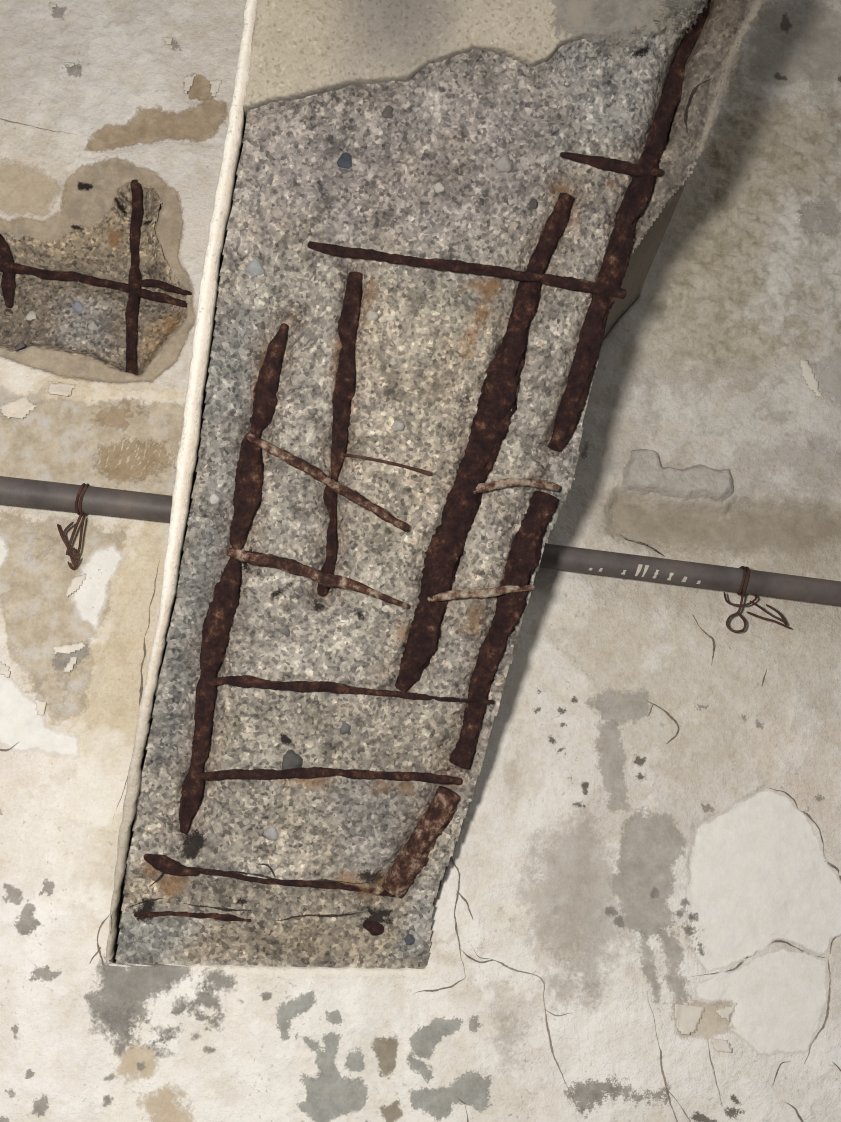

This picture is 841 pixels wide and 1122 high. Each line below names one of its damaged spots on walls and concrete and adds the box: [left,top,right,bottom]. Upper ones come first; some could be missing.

water stain [551,0,703,46]
crack [0,118,76,135]
spalling [0,157,196,397]
spalling [115,0,760,969]
peeling [66,546,122,629]
peeling [0,661,79,758]
crack [416,859,575,1102]
water stain [586,690,700,1009]
crack [647,993,691,1122]
peeling [673,790,841,1055]
crack [692,935,841,1122]
crack [770,788,841,881]